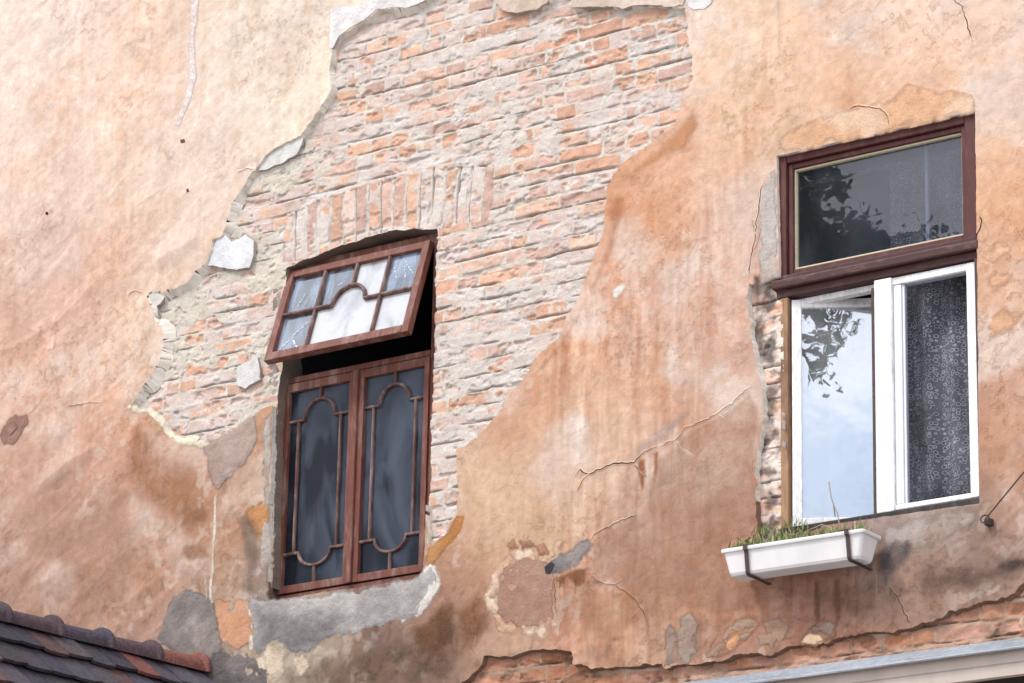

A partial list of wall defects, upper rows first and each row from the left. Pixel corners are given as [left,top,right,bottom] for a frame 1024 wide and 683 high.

crack [848,103,893,128]
crack [746,177,767,280]
spalling [127,0,712,649]
spalling [751,171,784,542]
peeling [0,414,28,445]
crack [573,382,753,492]
crack [589,513,637,543]
crack [588,573,649,624]
water stain [880,542,909,582]
water stain [925,560,1024,587]
spalling [471,591,1024,683]